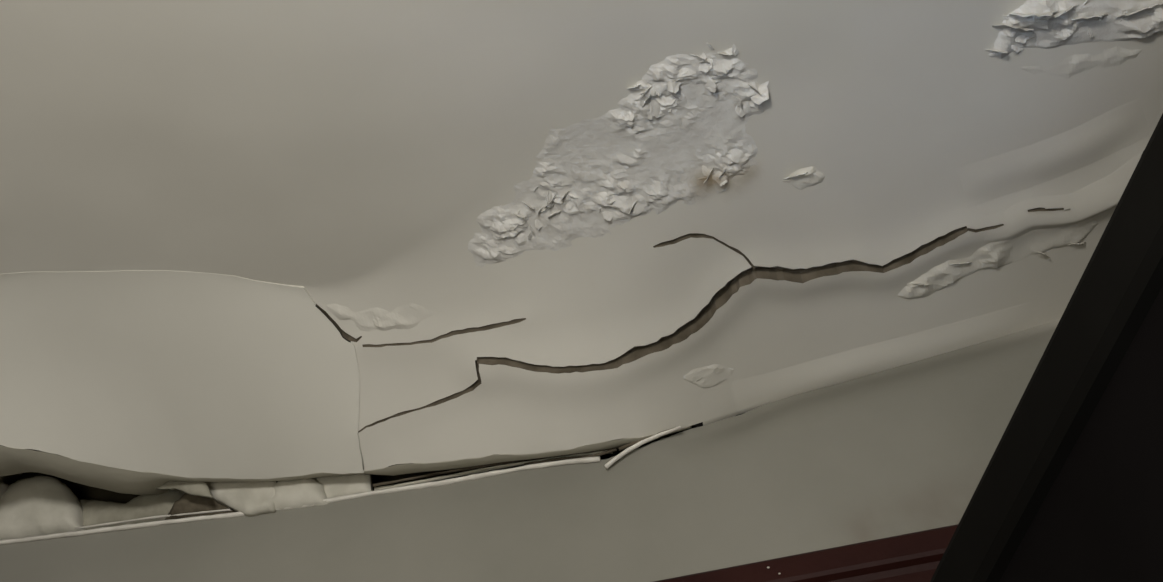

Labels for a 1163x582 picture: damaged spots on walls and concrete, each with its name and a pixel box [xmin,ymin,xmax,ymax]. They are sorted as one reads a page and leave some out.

peeling [985,0,1163,59]
peeling [467,43,769,268]
peeling [782,166,825,190]
peeling [897,218,1098,299]
crack [316,208,1068,433]
flaking render [156,481,276,517]
flaking render [315,474,373,498]